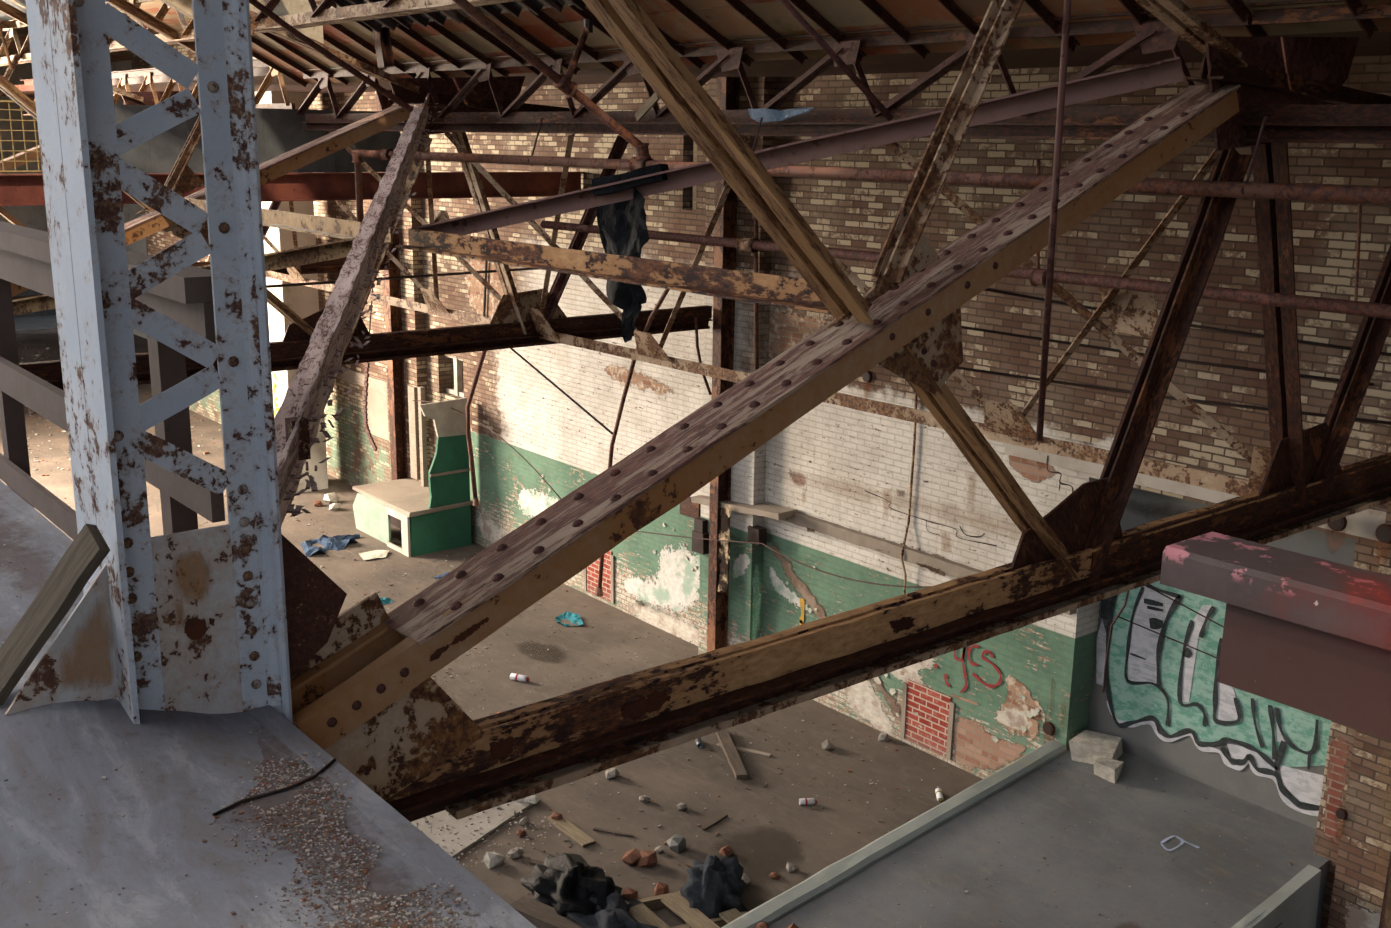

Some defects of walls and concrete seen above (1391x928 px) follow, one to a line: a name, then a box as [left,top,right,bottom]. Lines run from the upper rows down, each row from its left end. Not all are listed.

peeling [624,523,700,646]
peeling [718,504,750,592]
peeling [769,567,817,613]
corrosion [64,607,110,683]
flaking render [950,675,1055,771]